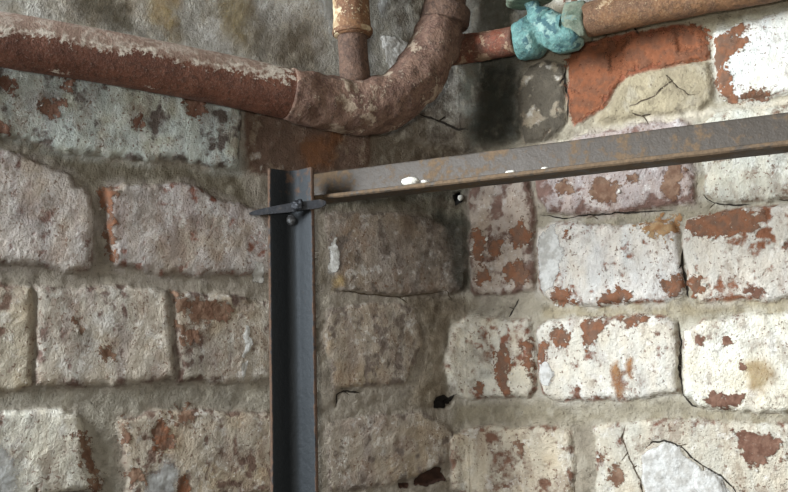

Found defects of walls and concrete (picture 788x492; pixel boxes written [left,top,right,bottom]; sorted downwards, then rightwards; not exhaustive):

crack [630,75,694,124]
spalling [562,22,773,124]
peeling [96,184,123,263]
peeling [470,216,536,288]
peeling [629,208,767,244]
peeling [659,271,707,299]
peeling [742,285,766,299]
peeling [491,284,650,395]
crack [678,325,697,407]
peeling [150,401,199,456]
peeling [176,470,192,492]
crack [621,428,736,492]